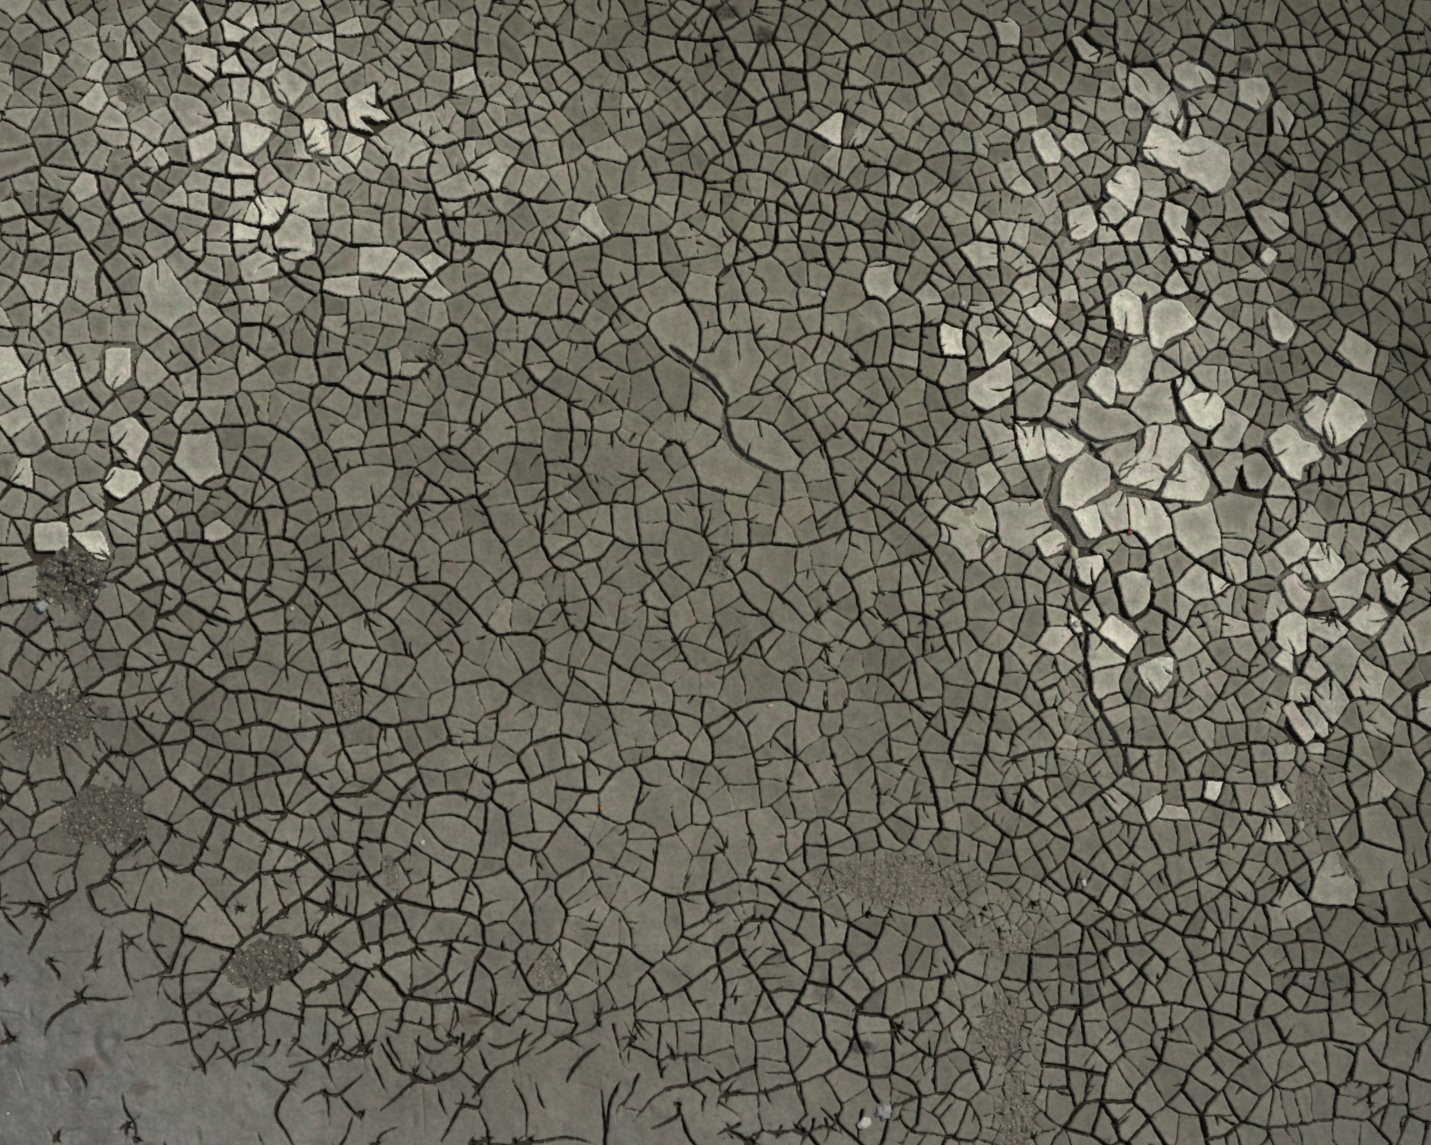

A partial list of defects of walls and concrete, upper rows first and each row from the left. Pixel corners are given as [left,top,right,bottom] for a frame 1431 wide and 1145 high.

spalling [117,78,150,108]
peeling [1068,546,1079,561]
crack [84,929,104,972]
crack [118,931,143,990]
crack [0,973,17,1045]
crack [43,986,127,1035]
crack [565,1044,599,1082]
crack [119,1095,165,1145]
crack [251,1065,302,1145]
crack [301,1074,364,1145]
crack [440,1080,589,1145]
crack [600,1083,619,1145]